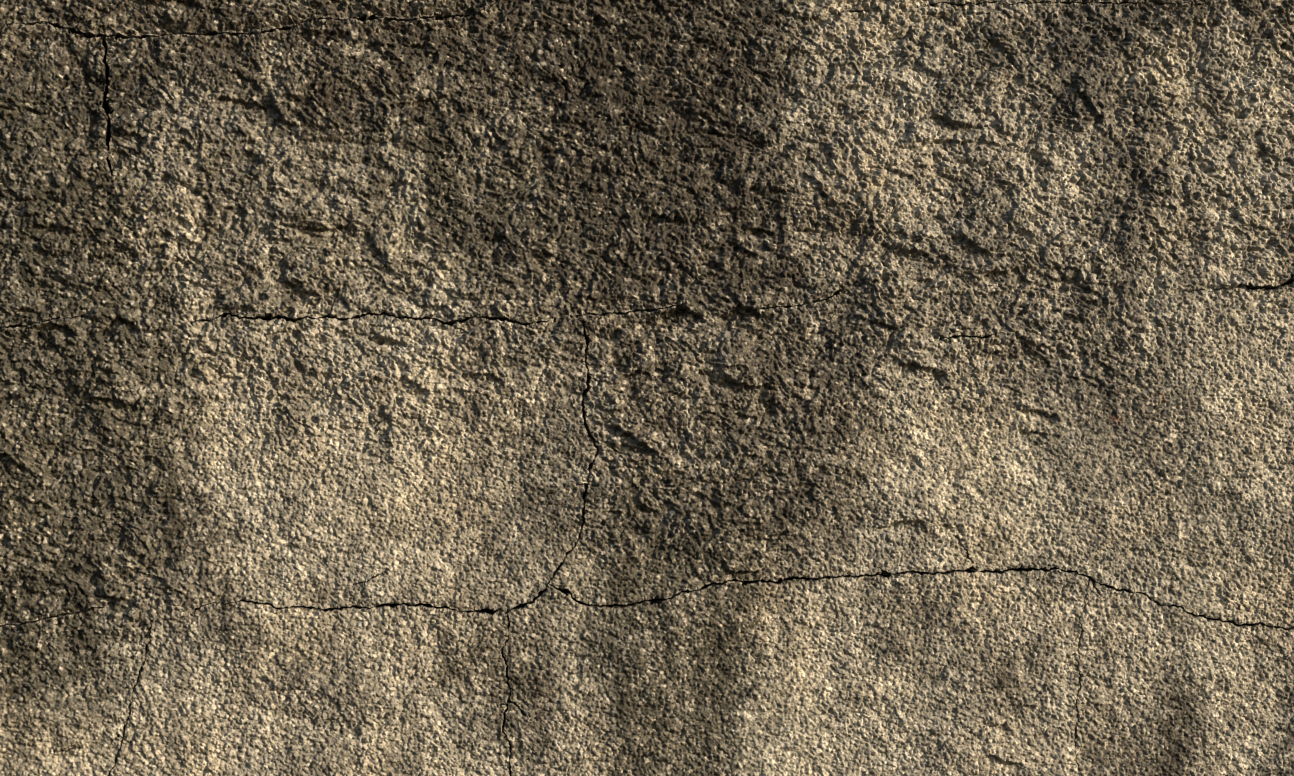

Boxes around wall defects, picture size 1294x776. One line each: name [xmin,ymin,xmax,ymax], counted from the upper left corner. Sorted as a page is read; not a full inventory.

crack [7,0,499,182]
crack [756,286,843,313]
crack [190,291,1294,776]
crack [0,602,109,629]
crack [55,745,79,755]
crack [104,620,155,776]